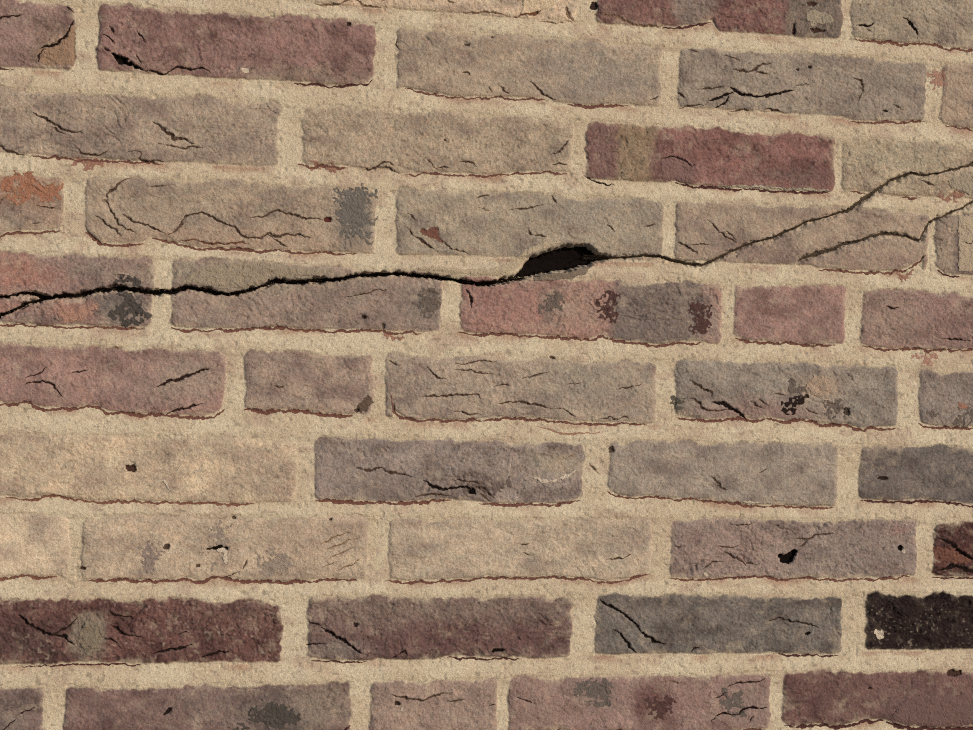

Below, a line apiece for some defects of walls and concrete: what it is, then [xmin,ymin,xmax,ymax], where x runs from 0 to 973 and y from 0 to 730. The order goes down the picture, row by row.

crack [298,140,614,237]
crack [0,113,523,349]
crack [582,155,973,278]
crack [171,323,421,355]
crack [458,332,701,348]
crack [0,367,353,420]
crack [7,494,254,507]
crack [316,467,580,507]
crack [387,360,910,653]
crack [89,532,361,585]
crack [19,610,229,667]
crack [306,621,366,664]